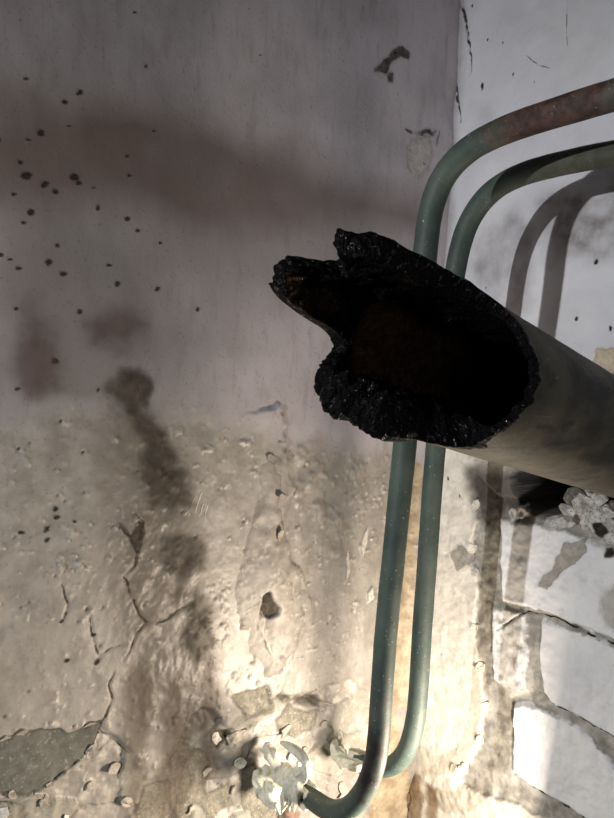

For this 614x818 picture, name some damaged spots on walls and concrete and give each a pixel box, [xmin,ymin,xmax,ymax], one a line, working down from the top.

flaking render [593,348,614,374]
leakage [97,371,191,507]
crack [90,514,189,654]
leakage [164,537,205,577]
spalling [509,504,531,525]
spalling [538,487,614,589]
leakage [183,594,215,659]
peeling [0,720,101,818]
crack [86,672,128,757]
spalling [120,749,300,818]
spalling [212,729,248,748]
spalling [232,686,328,738]